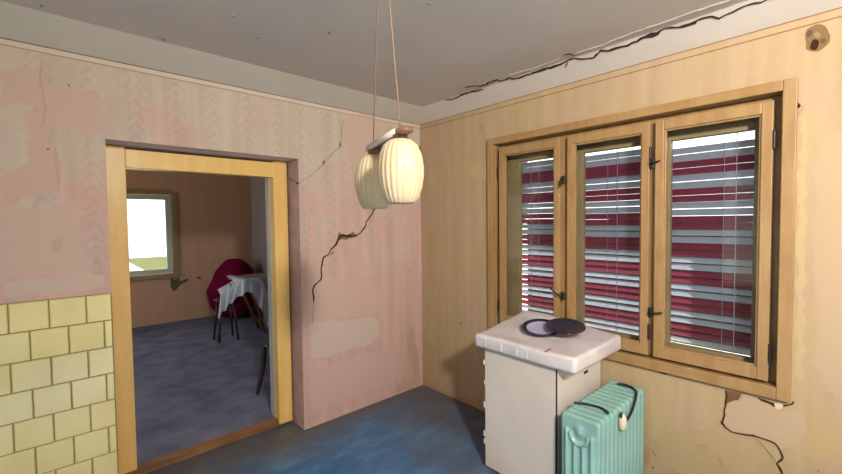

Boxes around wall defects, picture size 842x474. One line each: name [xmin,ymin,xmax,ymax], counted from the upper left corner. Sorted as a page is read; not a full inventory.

crack [446,0,767,101]
crack [290,122,343,184]
crack [312,209,375,324]
crack [720,390,784,474]